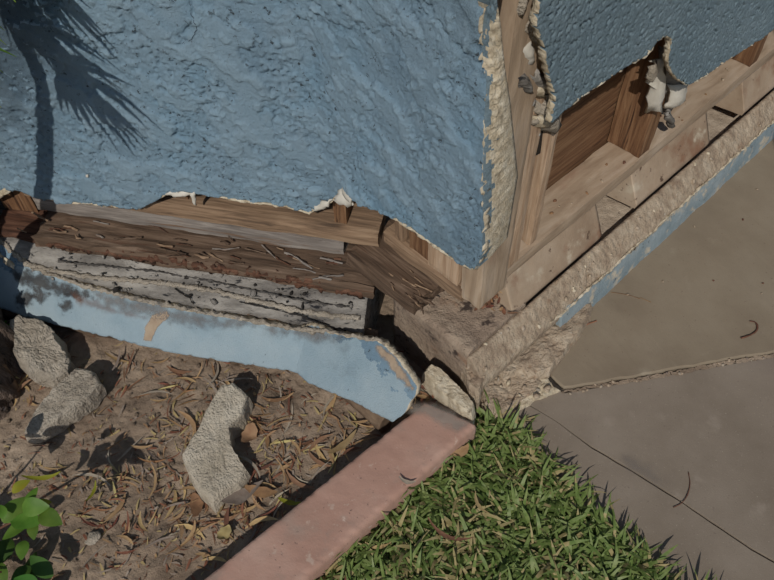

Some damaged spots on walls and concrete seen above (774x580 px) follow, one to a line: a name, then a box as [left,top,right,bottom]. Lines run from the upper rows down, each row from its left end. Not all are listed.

flaking render [632,36,733,128]
flaking render [463,0,562,270]
flaking render [161,191,197,206]
flaking render [220,187,354,214]
flaking render [394,218,454,260]
spalling [467,90,774,388]
spalling [0,237,413,389]
crack [548,353,774,394]